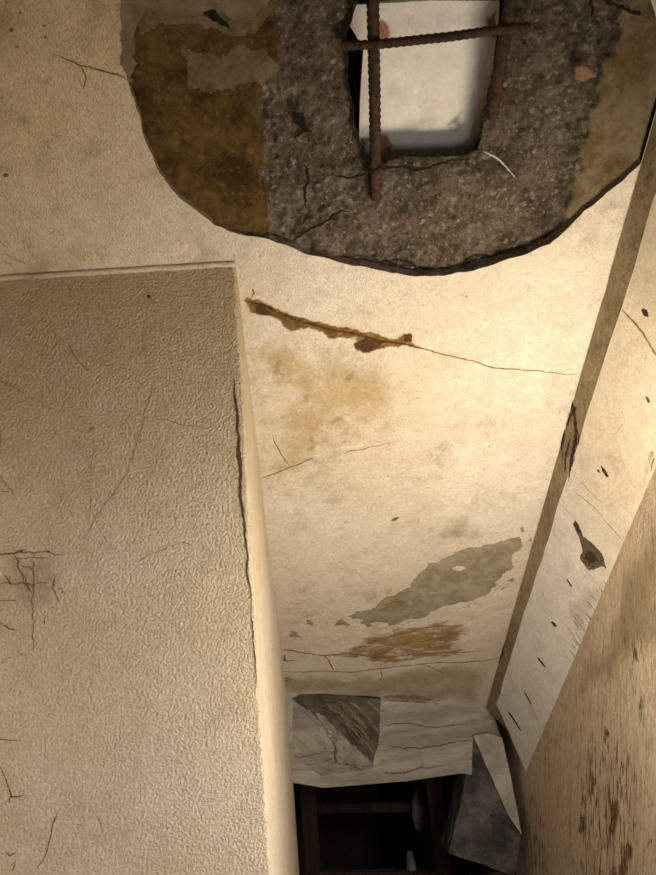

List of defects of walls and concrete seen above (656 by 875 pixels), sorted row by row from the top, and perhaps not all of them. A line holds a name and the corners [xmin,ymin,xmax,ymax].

rust [379,20,389,39]
spalling [120,0,656,271]
rust [244,290,424,353]
crack [413,345,568,375]
crack [233,380,314,684]
peeling [573,521,606,570]
crack [0,549,64,663]
peeling [335,527,532,630]
crack [284,654,498,680]